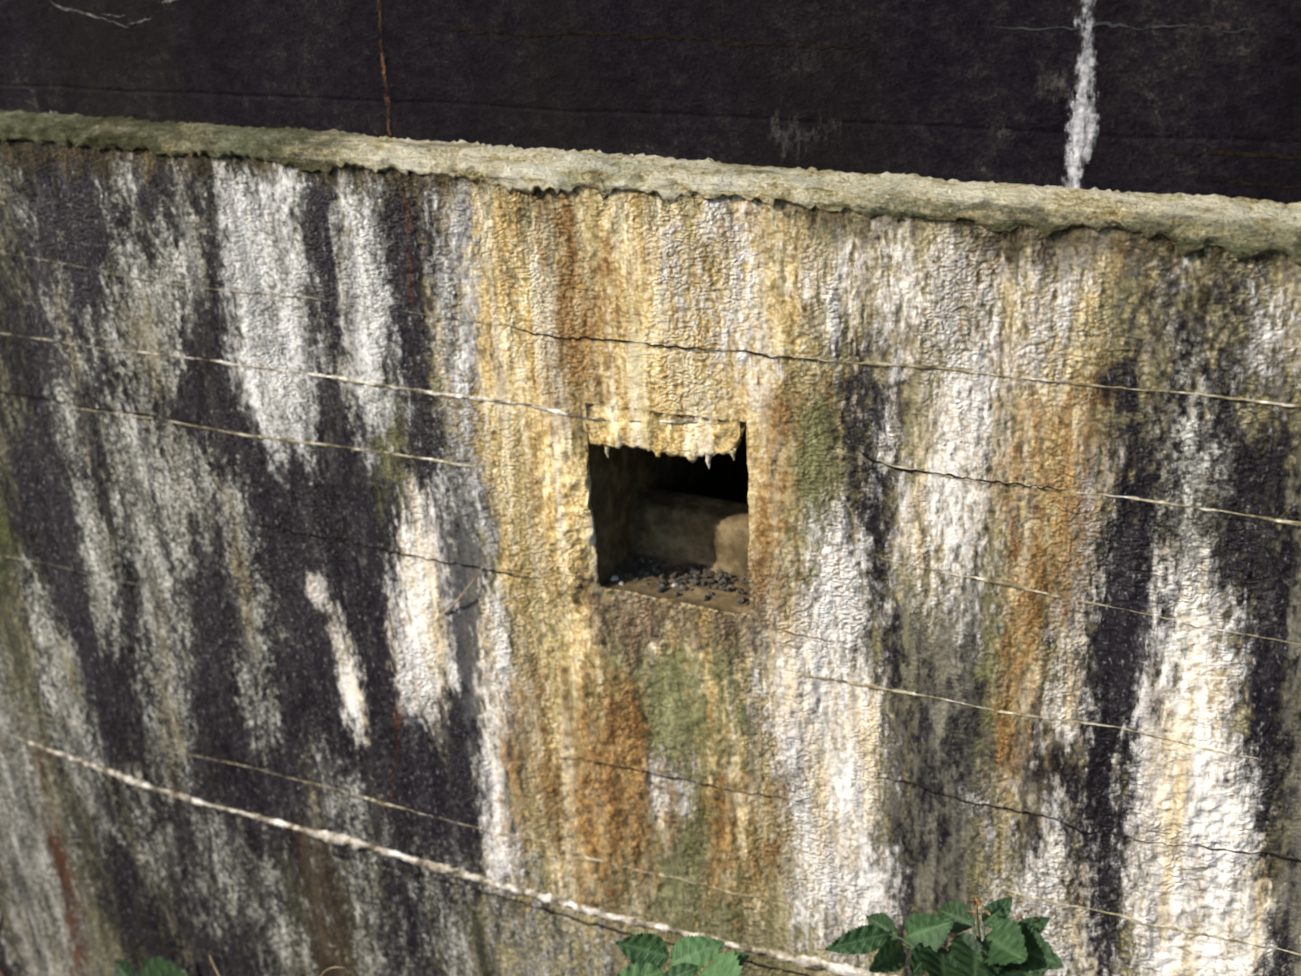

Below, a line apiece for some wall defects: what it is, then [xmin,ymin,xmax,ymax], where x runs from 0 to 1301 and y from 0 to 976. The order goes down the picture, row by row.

crack [52,0,175,28]
leakage [1063,0,1099,189]
corrosion [534,190,618,443]
leakage [0,139,403,976]
leakage [384,170,1301,976]
corrosion [992,378,1097,782]
corrosion [489,629,682,920]
corrosion [701,758,747,911]
crack [881,778,1301,870]